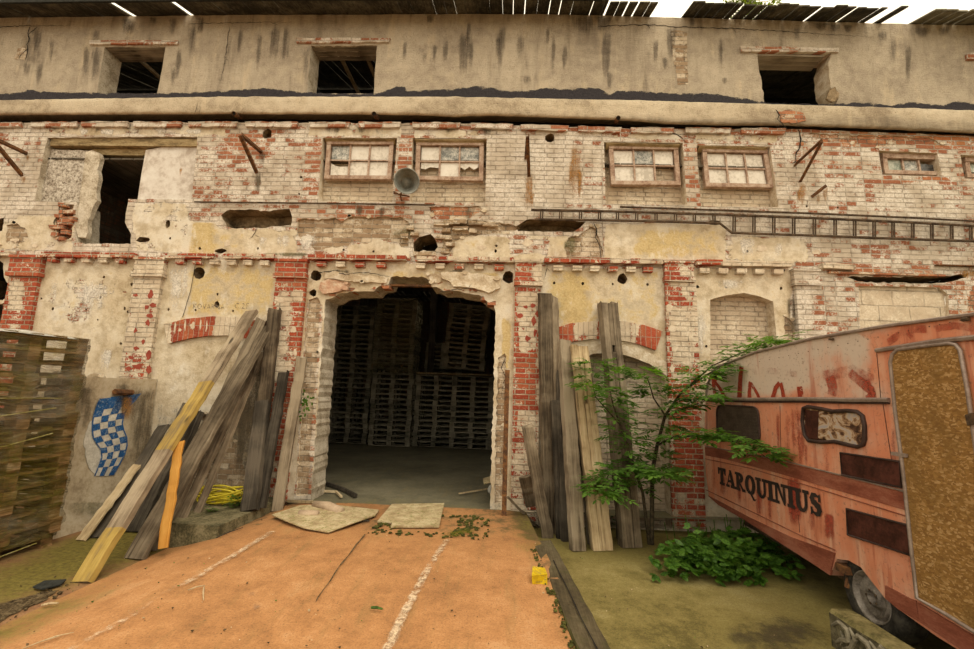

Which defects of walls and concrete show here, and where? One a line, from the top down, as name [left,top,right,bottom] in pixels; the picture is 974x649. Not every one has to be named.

flaking render [221,206,603,258]
spalling [503,271,513,283]
spalling [848,274,974,313]
peeling [126,289,157,374]